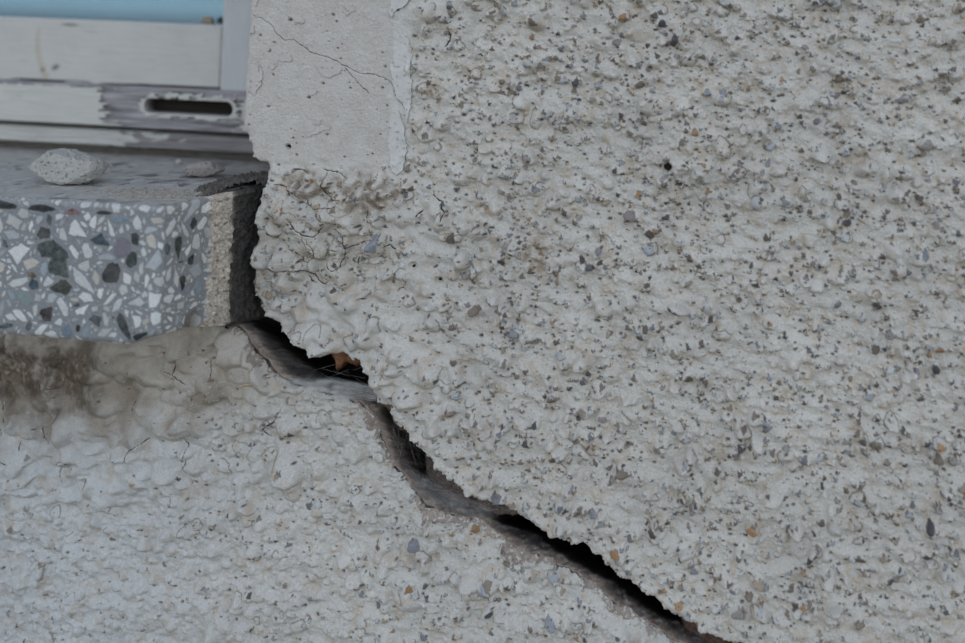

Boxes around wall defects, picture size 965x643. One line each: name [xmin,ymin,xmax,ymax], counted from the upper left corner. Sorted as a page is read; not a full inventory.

crack [259,17,403,105]
crack [265,169,396,286]
water stain [0,348,93,411]
crack [227,317,742,643]